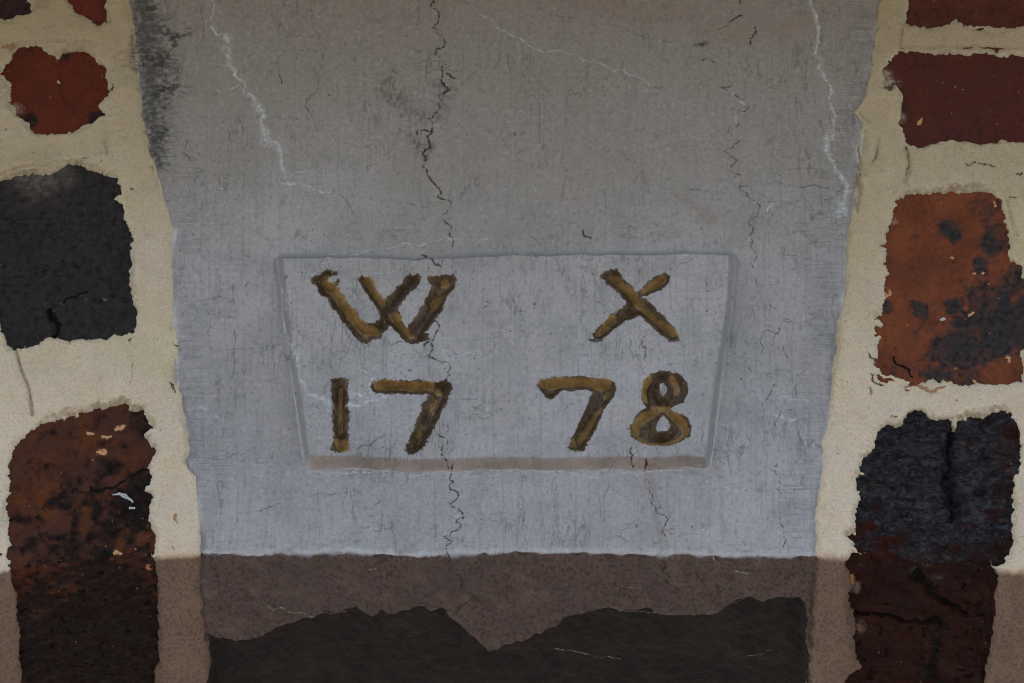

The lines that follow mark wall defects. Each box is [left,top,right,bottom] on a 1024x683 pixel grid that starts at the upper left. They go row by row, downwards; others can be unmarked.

crack [720,0,757,45]
crack [416,0,456,267]
crack [702,57,850,427]
crack [392,320,451,377]
crack [434,425,473,616]